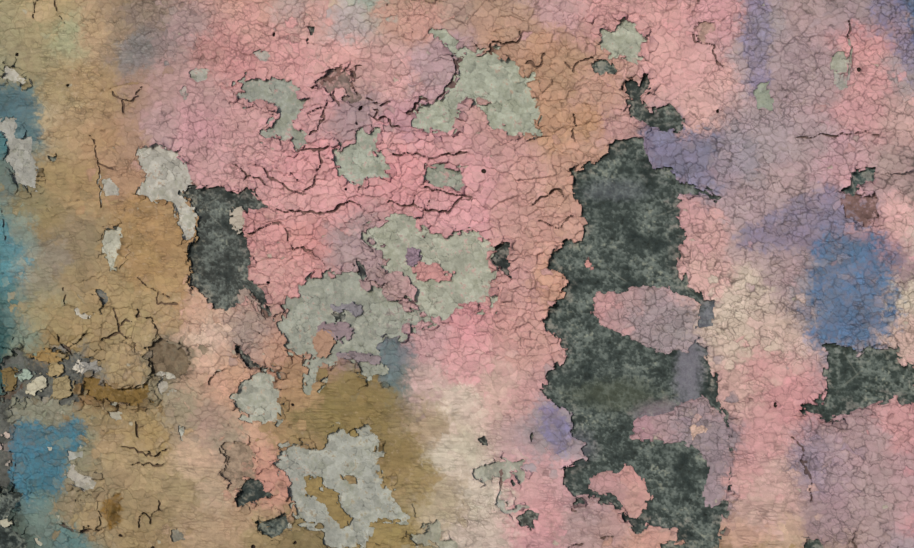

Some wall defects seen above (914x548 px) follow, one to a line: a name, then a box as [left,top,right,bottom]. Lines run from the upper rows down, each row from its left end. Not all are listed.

crack [692,32,723,67]
peeling [0,117,57,199]
crack [112,87,143,113]
crack [235,31,600,261]
crack [796,130,879,139]
crack [58,279,178,354]
peeling [94,28,553,548]
peeling [534,12,747,548]
peeling [793,336,914,431]
crack [122,422,167,467]
crack [791,436,813,501]
crack [60,522,100,533]